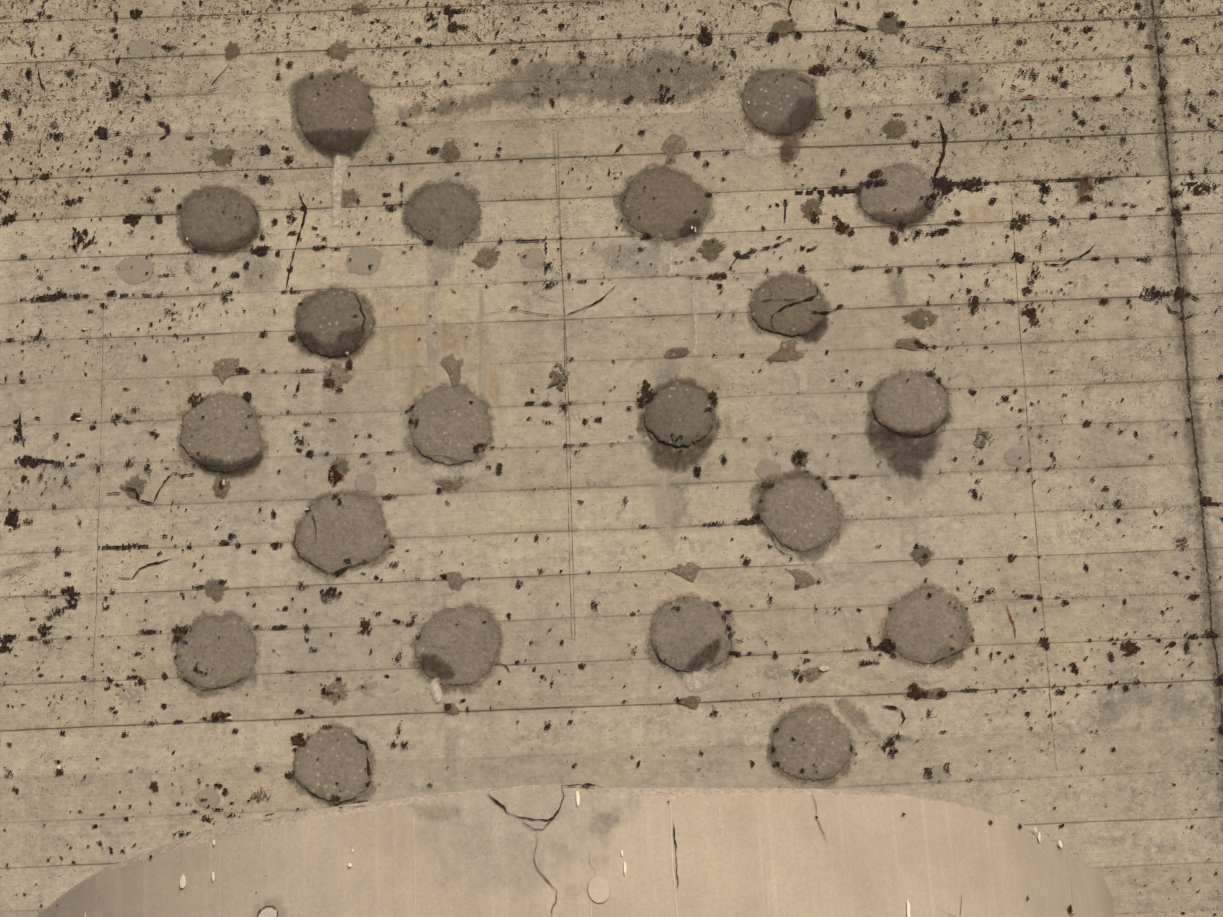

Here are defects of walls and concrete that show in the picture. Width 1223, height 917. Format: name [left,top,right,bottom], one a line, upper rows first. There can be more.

leakage [400,49,720,119]
crack [762,286,839,331]
leakage [867,387,947,494]
crack [487,784,601,912]